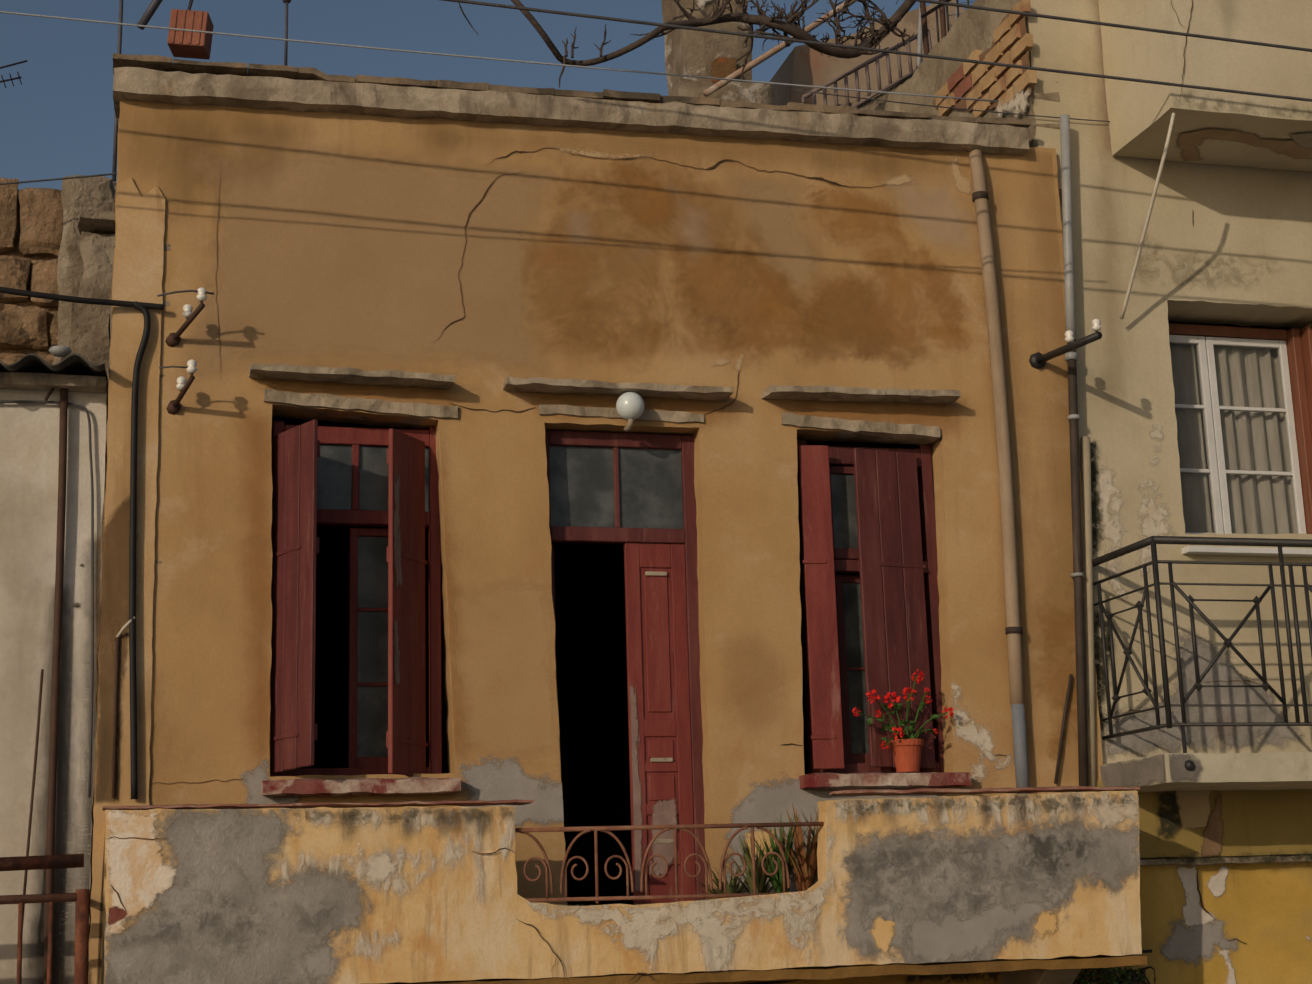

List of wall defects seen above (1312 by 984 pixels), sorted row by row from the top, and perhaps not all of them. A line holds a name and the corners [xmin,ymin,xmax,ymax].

peeling [1176,129,1312,161]
crack [431,148,915,343]
peeling [1095,424,1174,599]
peeling [281,808,515,899]
peeling [527,684,1139,971]
spalling [1160,790,1246,984]